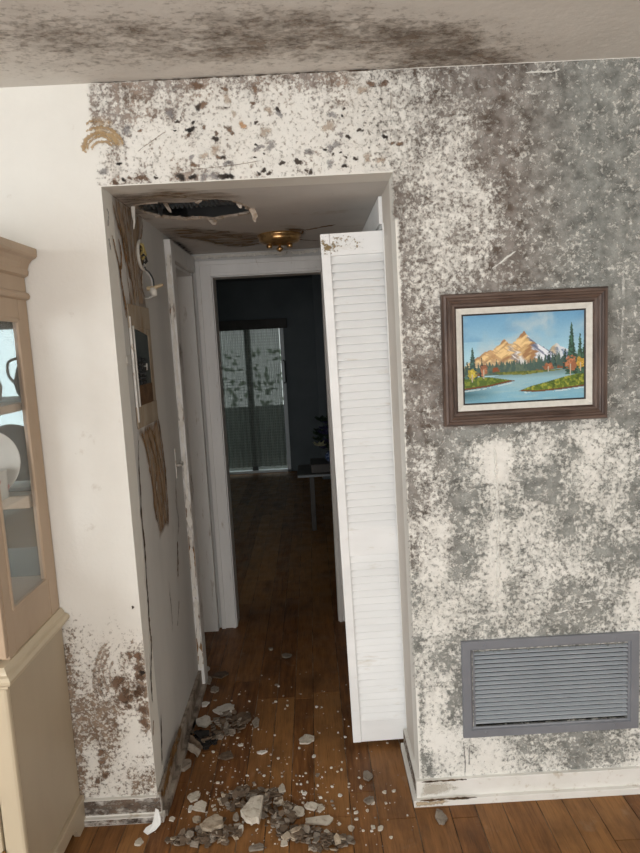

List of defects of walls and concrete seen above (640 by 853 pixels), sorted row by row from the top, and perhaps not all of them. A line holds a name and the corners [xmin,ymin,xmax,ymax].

spalling [131,202,224,229]
spalling [233,201,258,222]
damp [81,11,640,778]
damp [64,626,181,827]
damp [403,731,416,793]